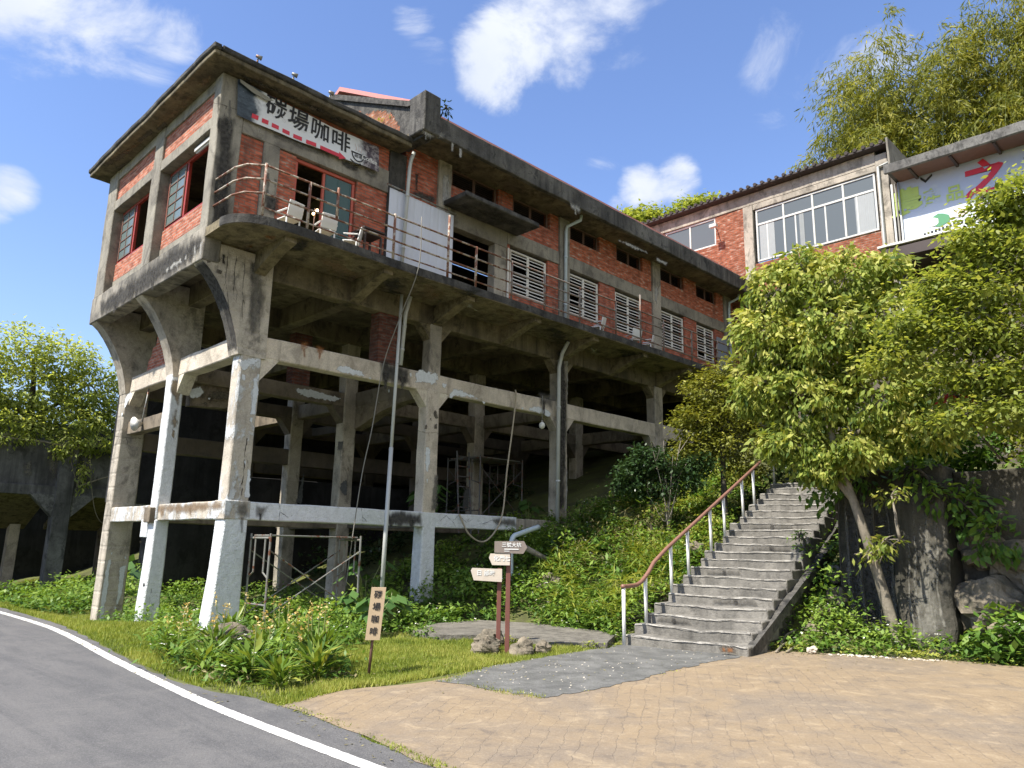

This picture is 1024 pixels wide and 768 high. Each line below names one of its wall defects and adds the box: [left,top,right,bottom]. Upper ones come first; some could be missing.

leakage [213,97,233,223]
peeling [238,358,259,422]
peeling [297,388,345,402]
peeling [337,366,371,379]
peeling [410,370,485,404]
leakage [239,504,264,531]